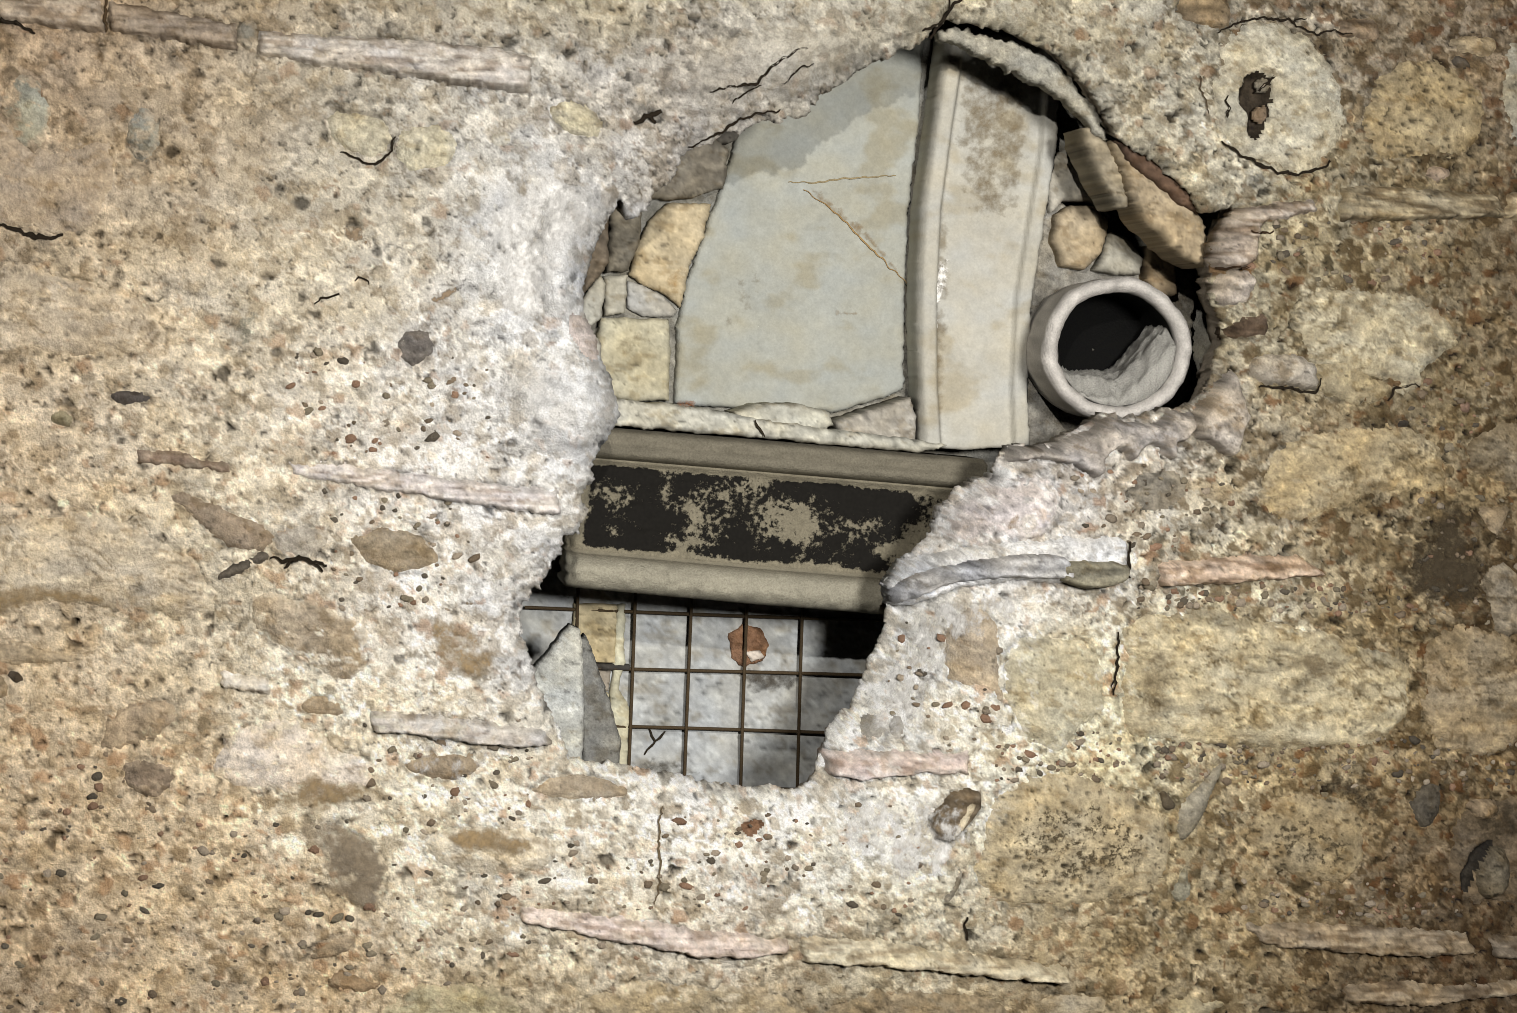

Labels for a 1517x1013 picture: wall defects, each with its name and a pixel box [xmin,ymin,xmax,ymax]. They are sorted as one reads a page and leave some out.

crack [922,0,962,39]
crack [688,47,814,148]
spalling [1239,71,1273,140]
spalling [1063,127,1317,340]
spalling [569,313,599,362]
spalling [1128,469,1186,512]
spalling [728,624,769,667]
crack [1111,632,1120,695]